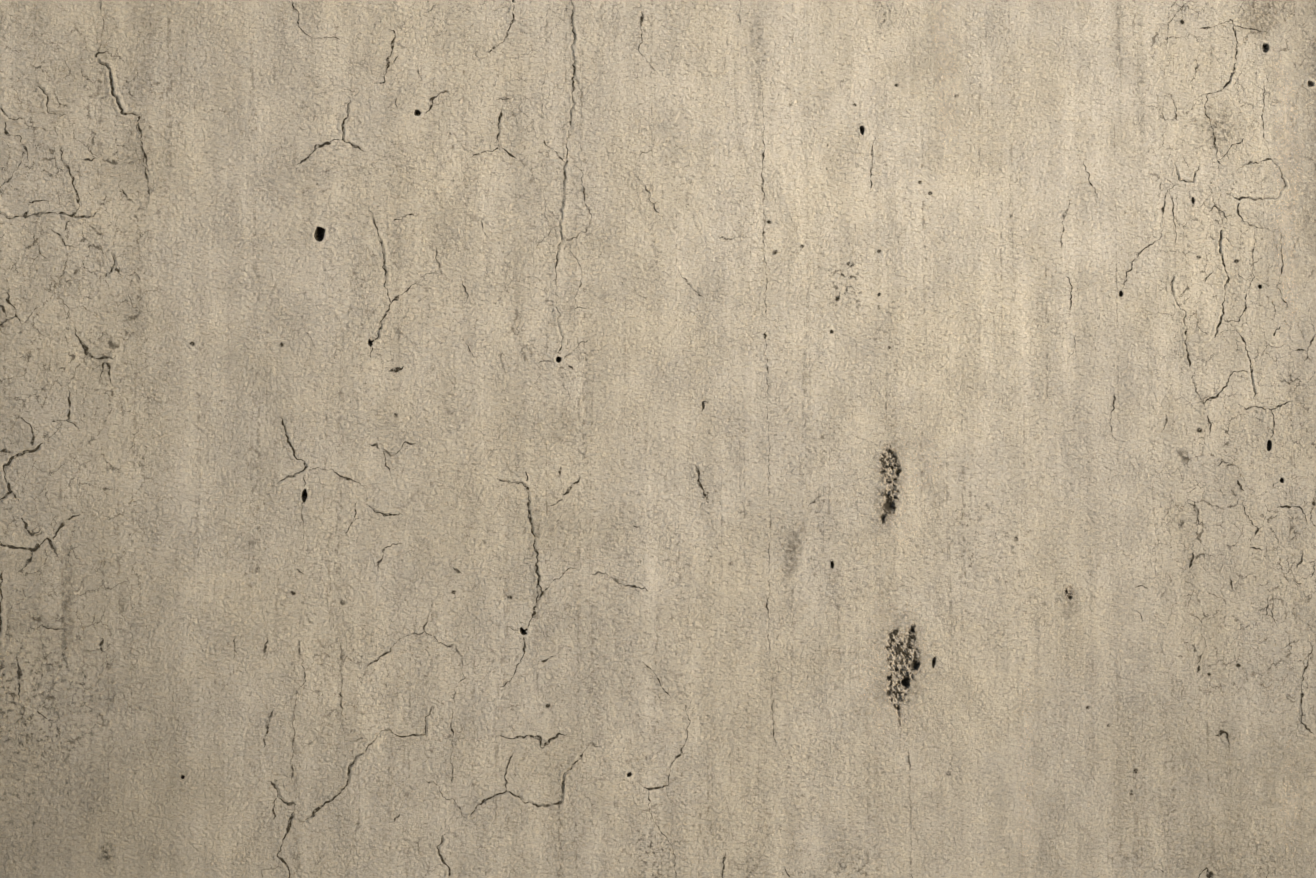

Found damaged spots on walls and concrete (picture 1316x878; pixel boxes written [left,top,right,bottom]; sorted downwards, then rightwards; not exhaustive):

crack [0,3,150,247]
crack [100,251,121,279]
crack [297,29,451,165]
crack [370,214,469,372]
crack [472,0,592,370]
crack [274,414,416,574]
crack [495,467,647,687]
crack [1219,461,1315,584]
crack [262,615,598,878]
crack [1266,600,1313,733]